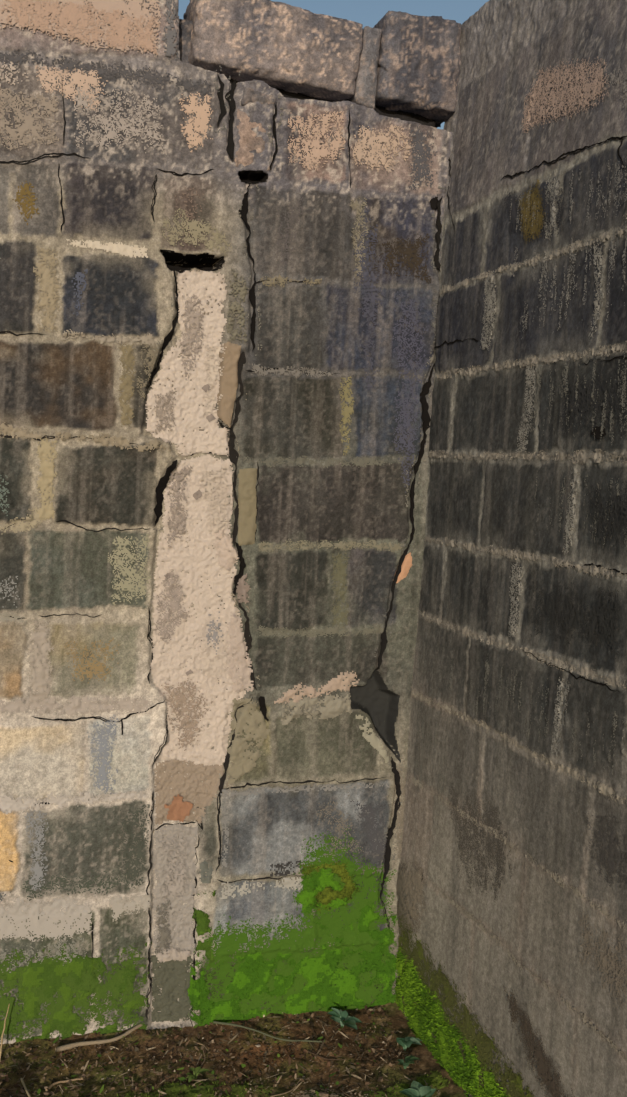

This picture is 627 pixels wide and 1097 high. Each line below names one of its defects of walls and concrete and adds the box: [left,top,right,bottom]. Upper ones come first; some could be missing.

crack [0,81,91,231]
crack [151,75,236,221]
peeling [161,208,248,259]
crack [433,158,455,306]
crack [501,136,627,180]
peeling [137,335,176,410]
spalling [202,268,262,428]
crack [56,103,423,1019]
spalling [227,468,257,561]
crack [375,338,479,670]
crack [32,607,168,764]
water stain [503,985,575,1097]